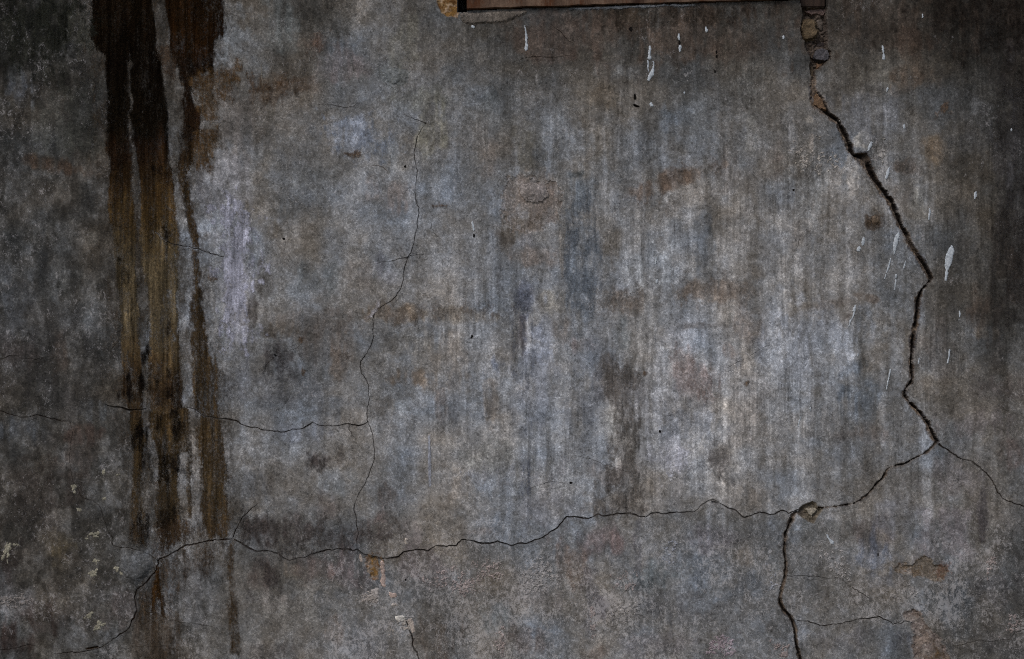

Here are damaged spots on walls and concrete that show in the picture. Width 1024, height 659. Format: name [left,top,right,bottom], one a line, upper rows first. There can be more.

water stain [0,0,351,659]
crack [54,111,911,659]
spalling [796,2,836,77]
crack [805,76,1024,513]